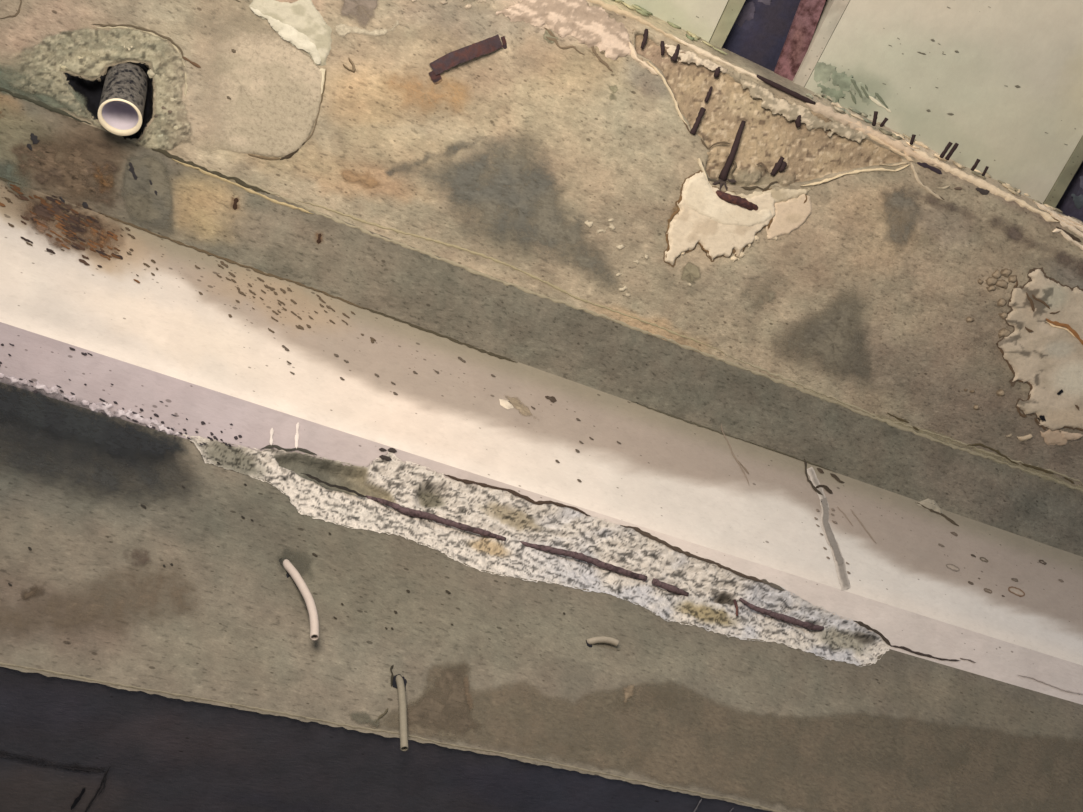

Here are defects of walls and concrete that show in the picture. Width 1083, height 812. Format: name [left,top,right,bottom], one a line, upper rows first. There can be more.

rust [9,133,157,267]
leakage [0,373,189,497]
crack [98,212,516,362]
spalling [89,398,892,667]
leakage [433,140,630,297]
crack [631,401,876,591]
spalling [496,0,1083,267]
peeling [978,267,1083,446]
crack [892,645,976,663]